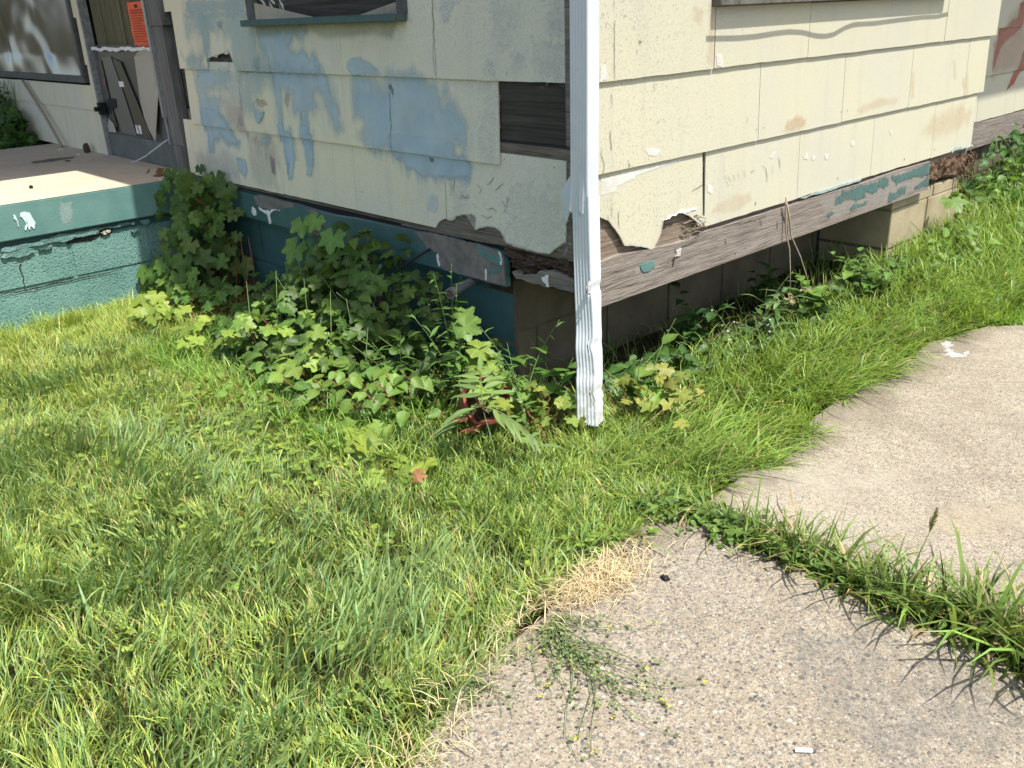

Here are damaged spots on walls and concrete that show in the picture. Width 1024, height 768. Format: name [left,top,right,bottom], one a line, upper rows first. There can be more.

peeling [601,148,683,195]
peeling [802,162,930,218]
spalling [0,219,150,258]
peeling [415,213,563,286]
spalling [600,207,706,249]